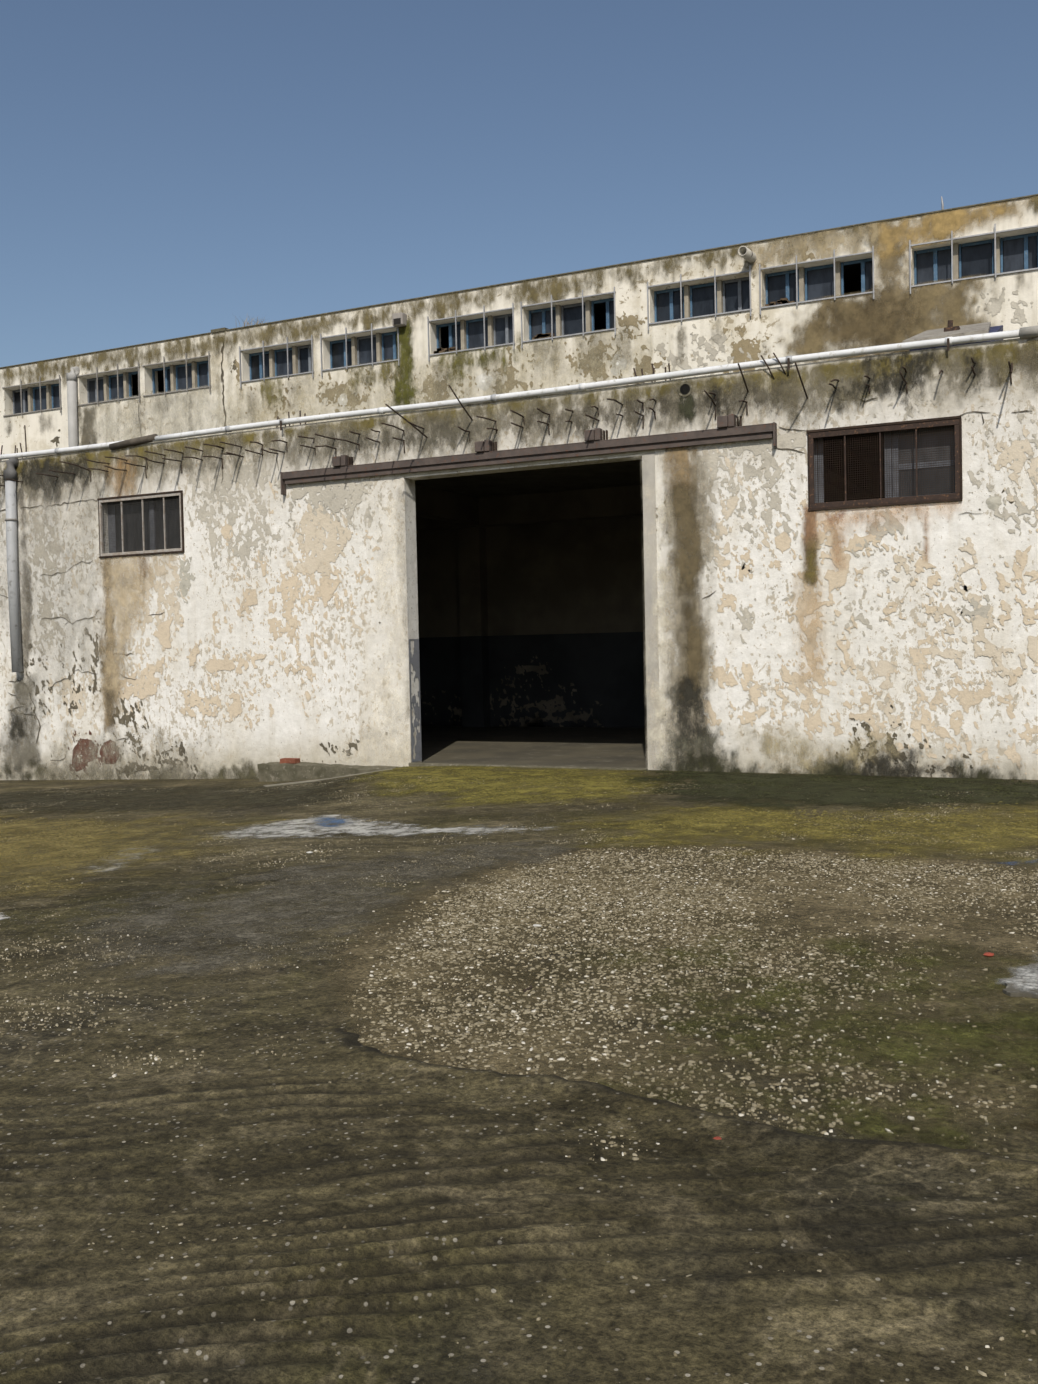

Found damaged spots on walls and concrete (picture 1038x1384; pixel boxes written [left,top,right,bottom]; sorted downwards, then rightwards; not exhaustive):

leakage [754,203,1017,410]
leakage [0,388,376,814]
peeling [0,287,1038,780]
leakage [652,446,718,771]